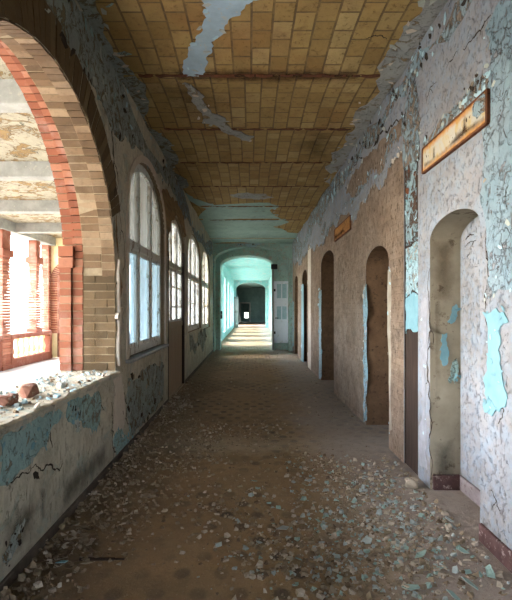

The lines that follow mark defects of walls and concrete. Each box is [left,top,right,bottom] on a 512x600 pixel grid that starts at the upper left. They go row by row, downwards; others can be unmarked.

flaking render [45,0,512,470]
crack [11,463,63,484]
peeling [0,391,102,486]